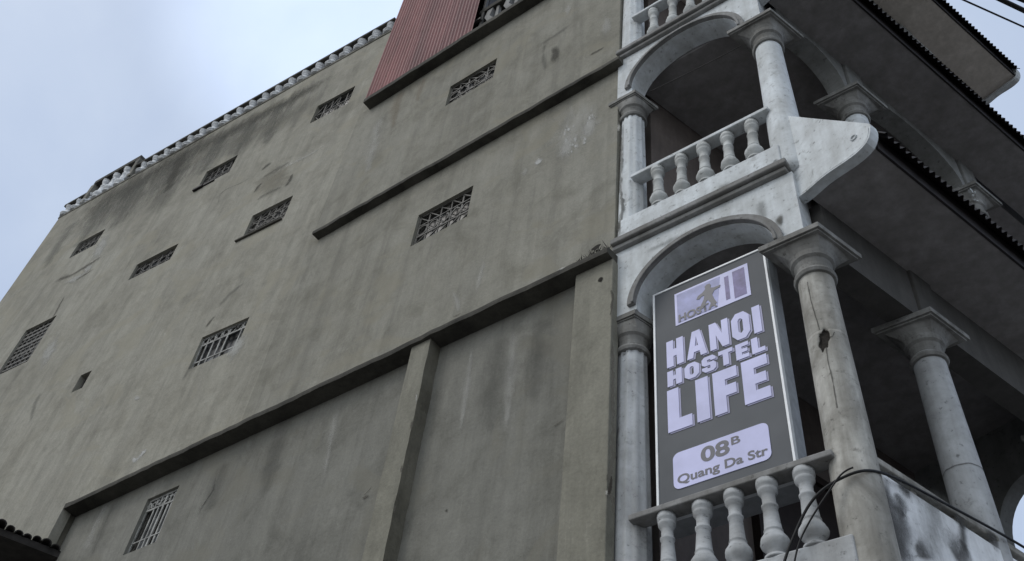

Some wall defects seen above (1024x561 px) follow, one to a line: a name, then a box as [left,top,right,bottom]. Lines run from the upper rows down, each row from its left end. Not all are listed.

flaking render [807,282,838,408]
damp [885,482,931,560]
damp [951,514,969,561]